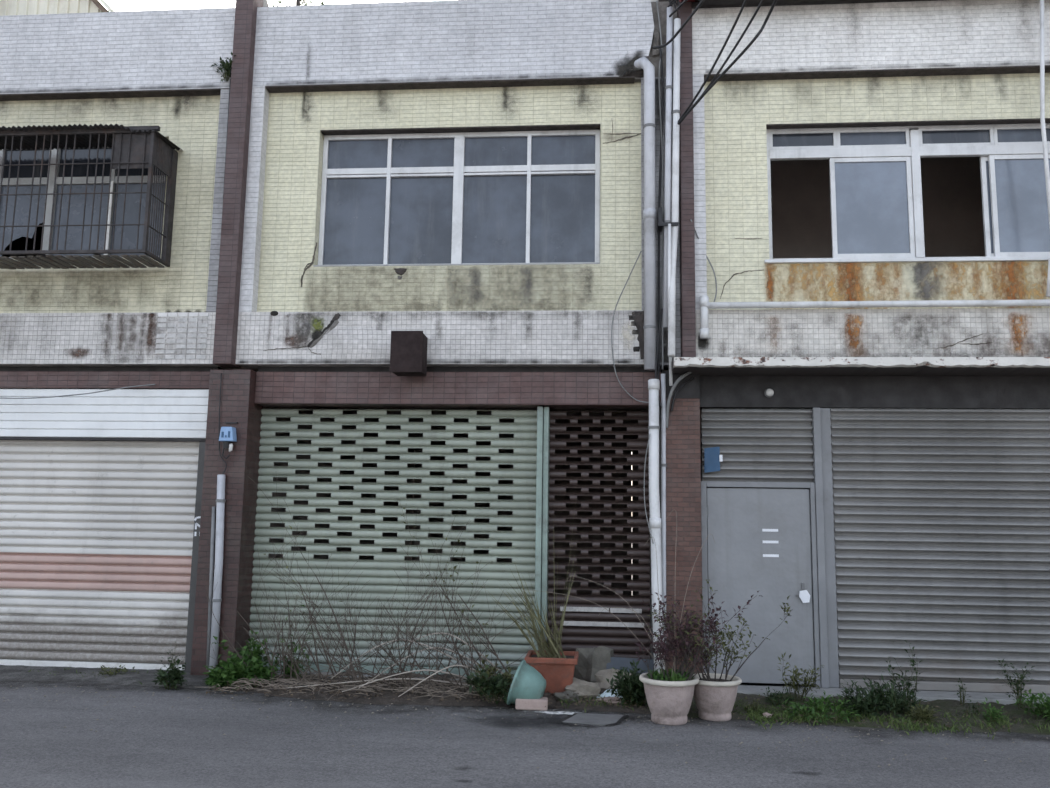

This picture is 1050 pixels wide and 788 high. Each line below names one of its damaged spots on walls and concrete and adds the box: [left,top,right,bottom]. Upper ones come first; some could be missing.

crack [301,243,317,287]
damp [455,271,566,329]
rust [767,263,898,351]
rust [928,262,1048,353]